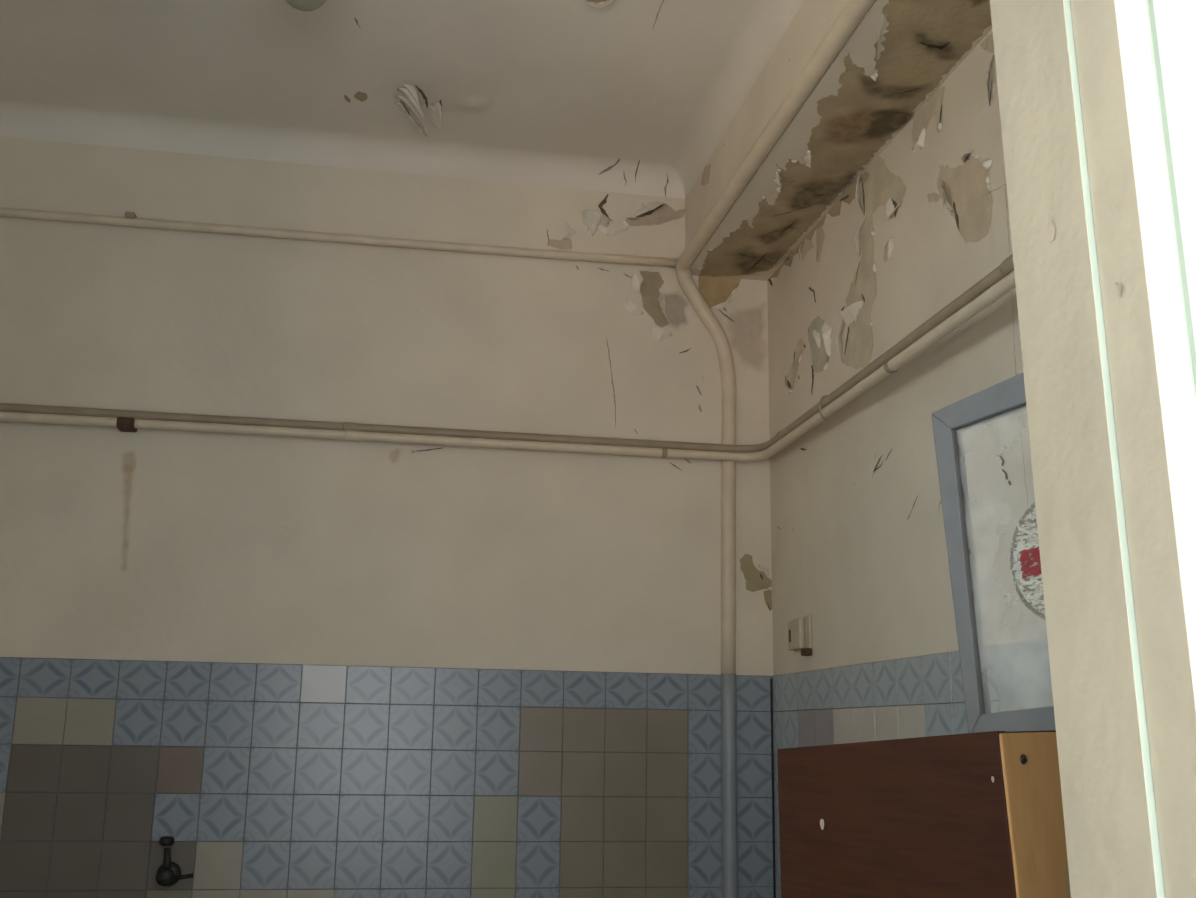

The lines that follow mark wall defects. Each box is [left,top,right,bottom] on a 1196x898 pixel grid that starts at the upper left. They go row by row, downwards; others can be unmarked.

peeling [392,80,442,137]
peeling [547,174,686,250]
peeling [698,0,997,395]
peeling [623,269,672,342]
peeling [738,554,772,611]